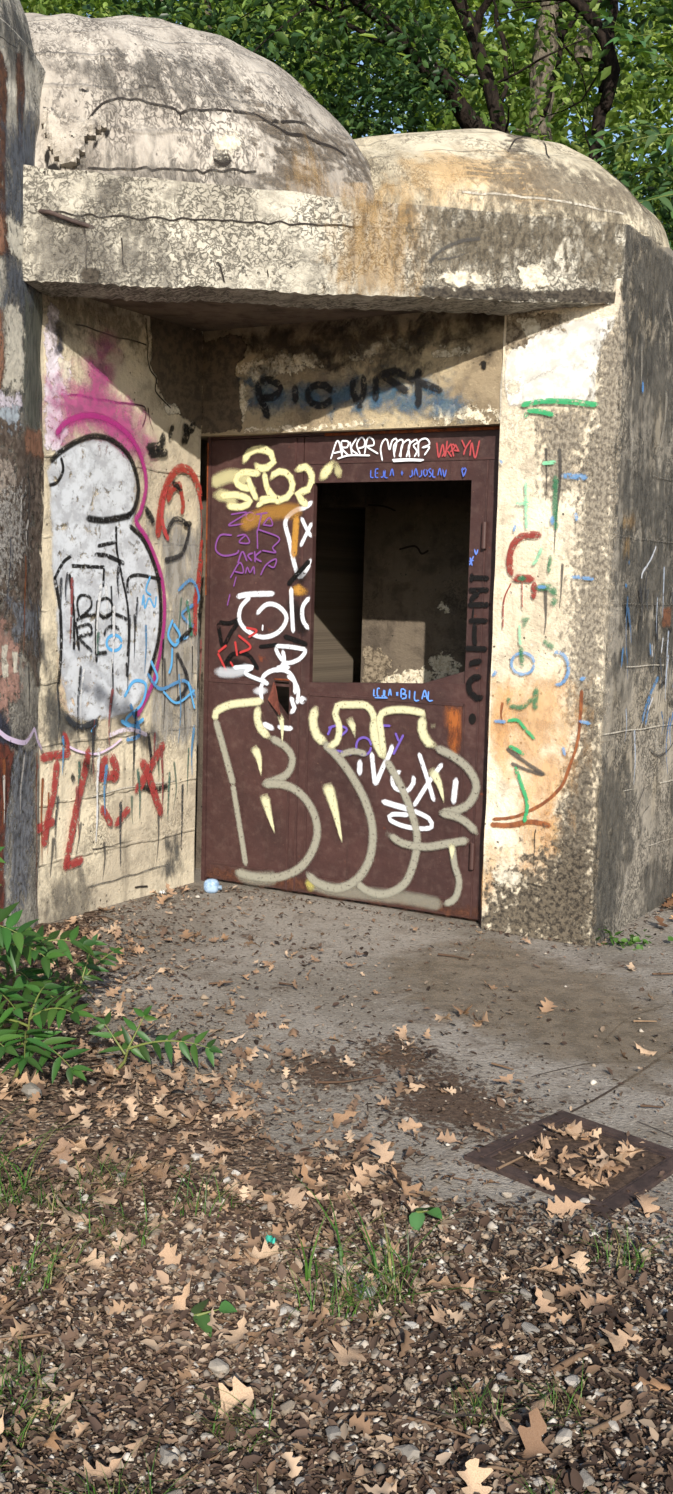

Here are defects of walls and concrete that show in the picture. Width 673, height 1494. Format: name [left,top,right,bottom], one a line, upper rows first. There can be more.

damp [83,55,235,110]
crack [81,85,279,123]
damp [244,311,505,396]
peeling [349,336,473,363]
damp [406,133,673,727]
peeling [416,260,626,947]
peeling [362,645,462,683]
damp [592,743,673,942]